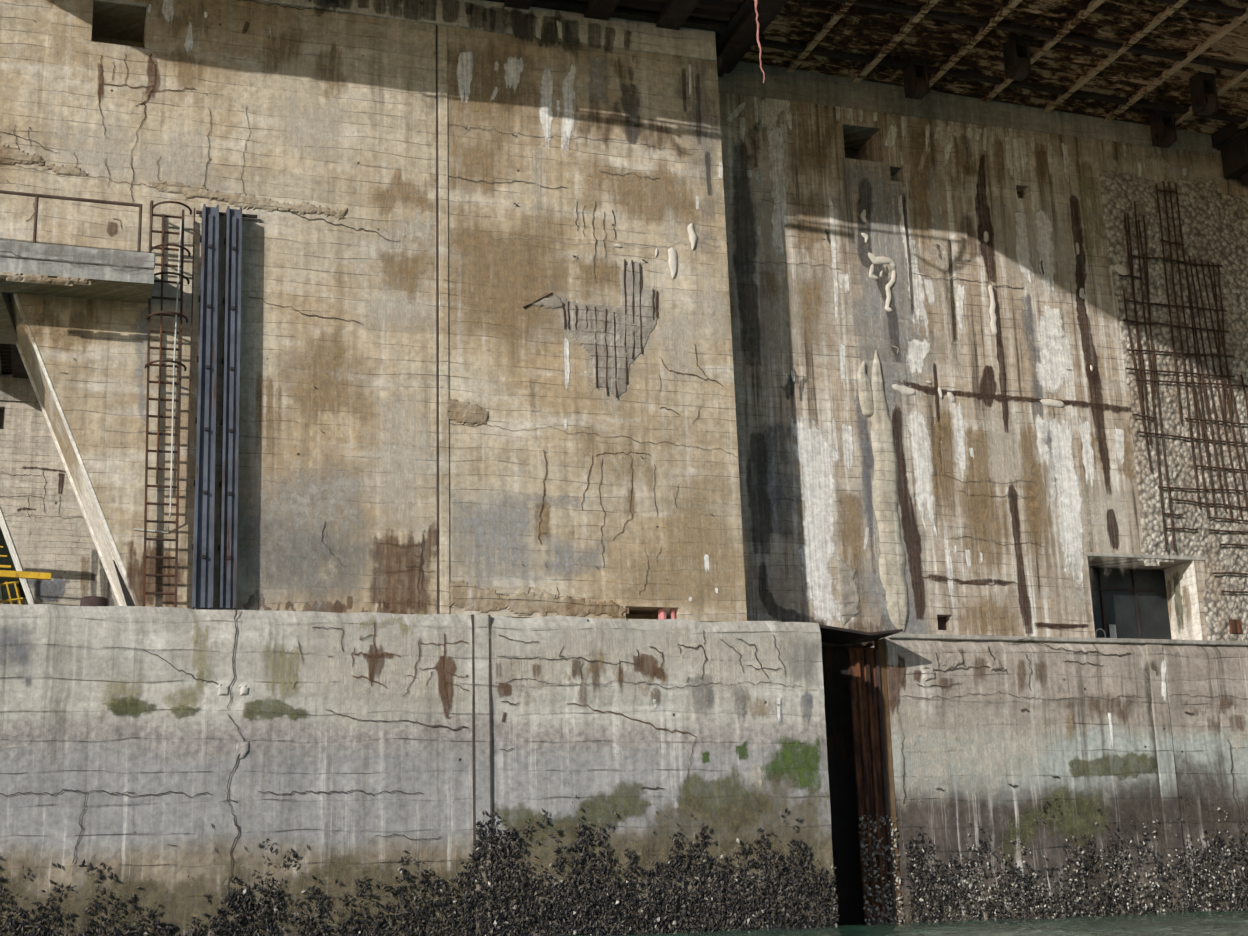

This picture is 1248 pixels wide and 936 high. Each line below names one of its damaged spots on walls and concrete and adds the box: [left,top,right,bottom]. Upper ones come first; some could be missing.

crack [0,52,251,203]
water stain [422,0,684,207]
spalling [523,259,659,407]
crack [450,344,736,595]
water stain [585,64,1222,636]
spalling [1099,169,1248,641]
crack [0,608,424,894]
corrosion [363,645,393,680]
corrosion [435,656,456,718]
crack [294,622,804,790]
corrosion [618,654,663,703]
water stain [1145,661,1167,858]